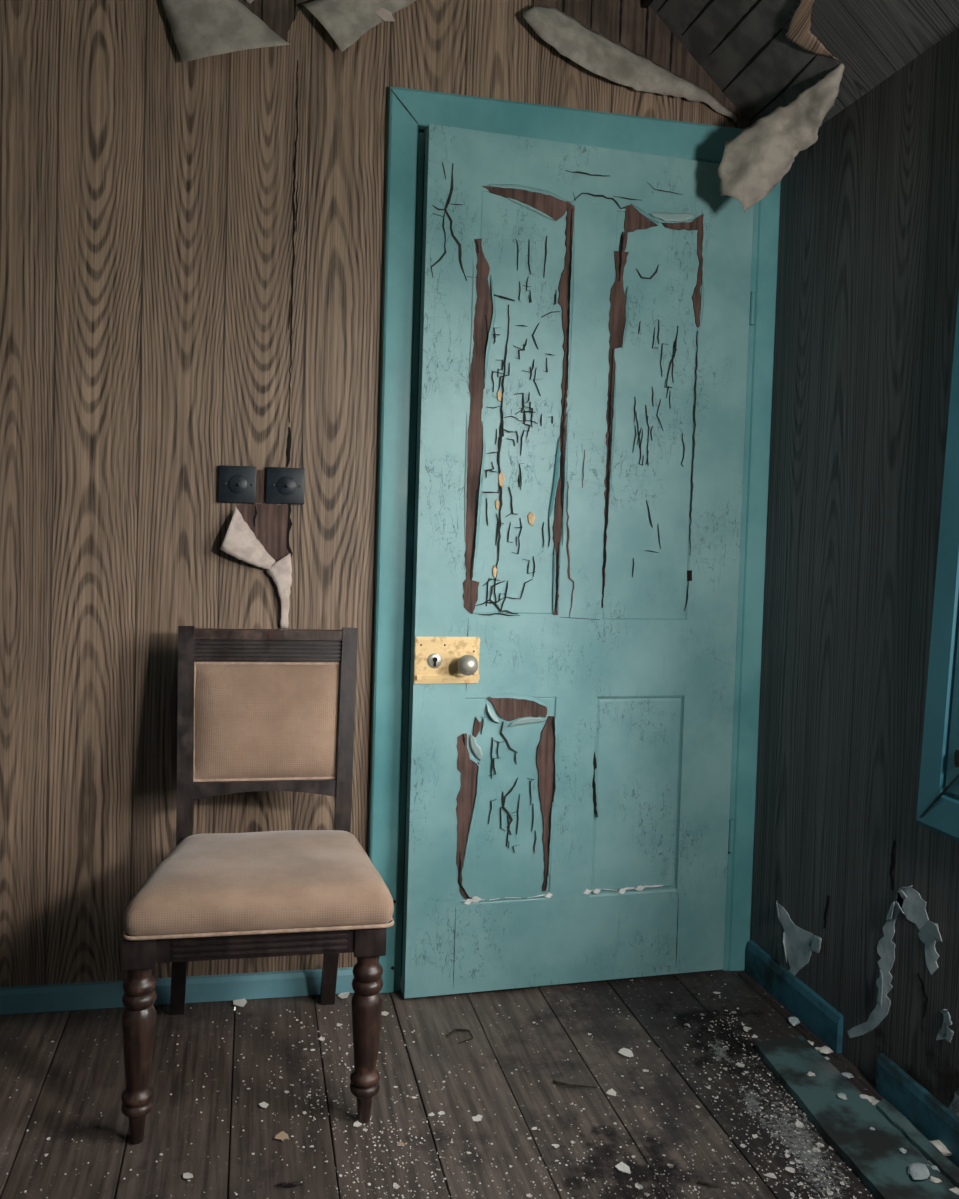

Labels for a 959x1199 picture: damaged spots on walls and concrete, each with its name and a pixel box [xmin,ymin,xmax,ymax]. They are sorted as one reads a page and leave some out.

peeling [462,238,505,614]
peeling [482,184,575,615]
peeling [602,203,704,595]
peeling [456,693,560,905]
peeling [776,901,822,976]
peeling [847,885,943,1038]
peeling [936,1009,954,1043]